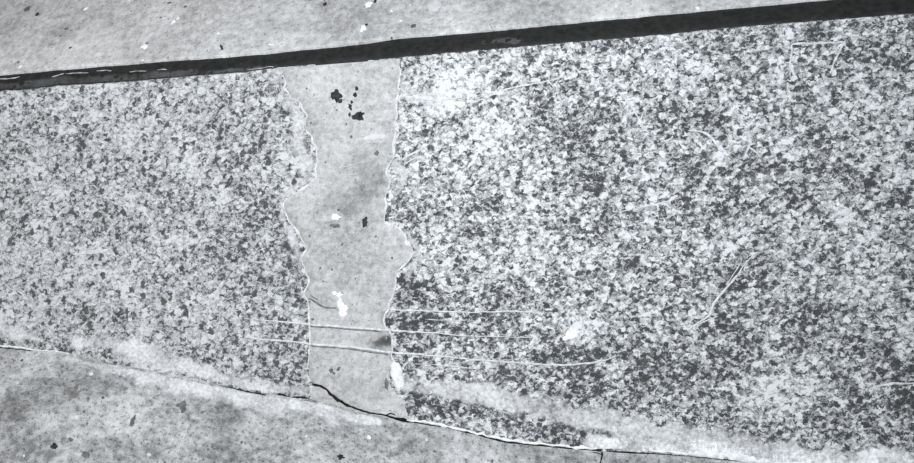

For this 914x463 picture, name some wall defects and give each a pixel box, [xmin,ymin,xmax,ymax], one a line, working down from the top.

spalling [331,86,365,125]
peeling [364,134,386,156]
spalling [385,361,404,392]
crack [219,382,740,463]